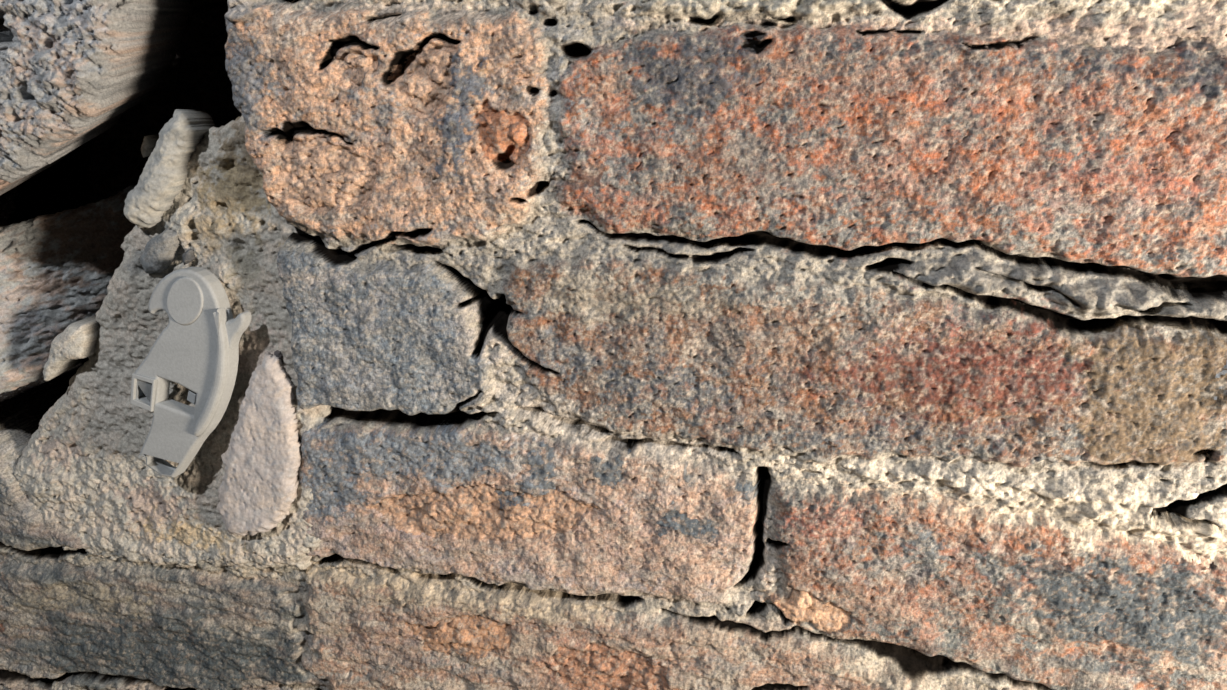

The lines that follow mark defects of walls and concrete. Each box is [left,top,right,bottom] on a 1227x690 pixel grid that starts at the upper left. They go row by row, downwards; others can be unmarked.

crack [319,15,460,86]
crack [289,228,558,374]
crack [579,220,1227,335]
crack [318,390,491,428]
crack [320,553,380,567]
crack [420,406,1053,690]